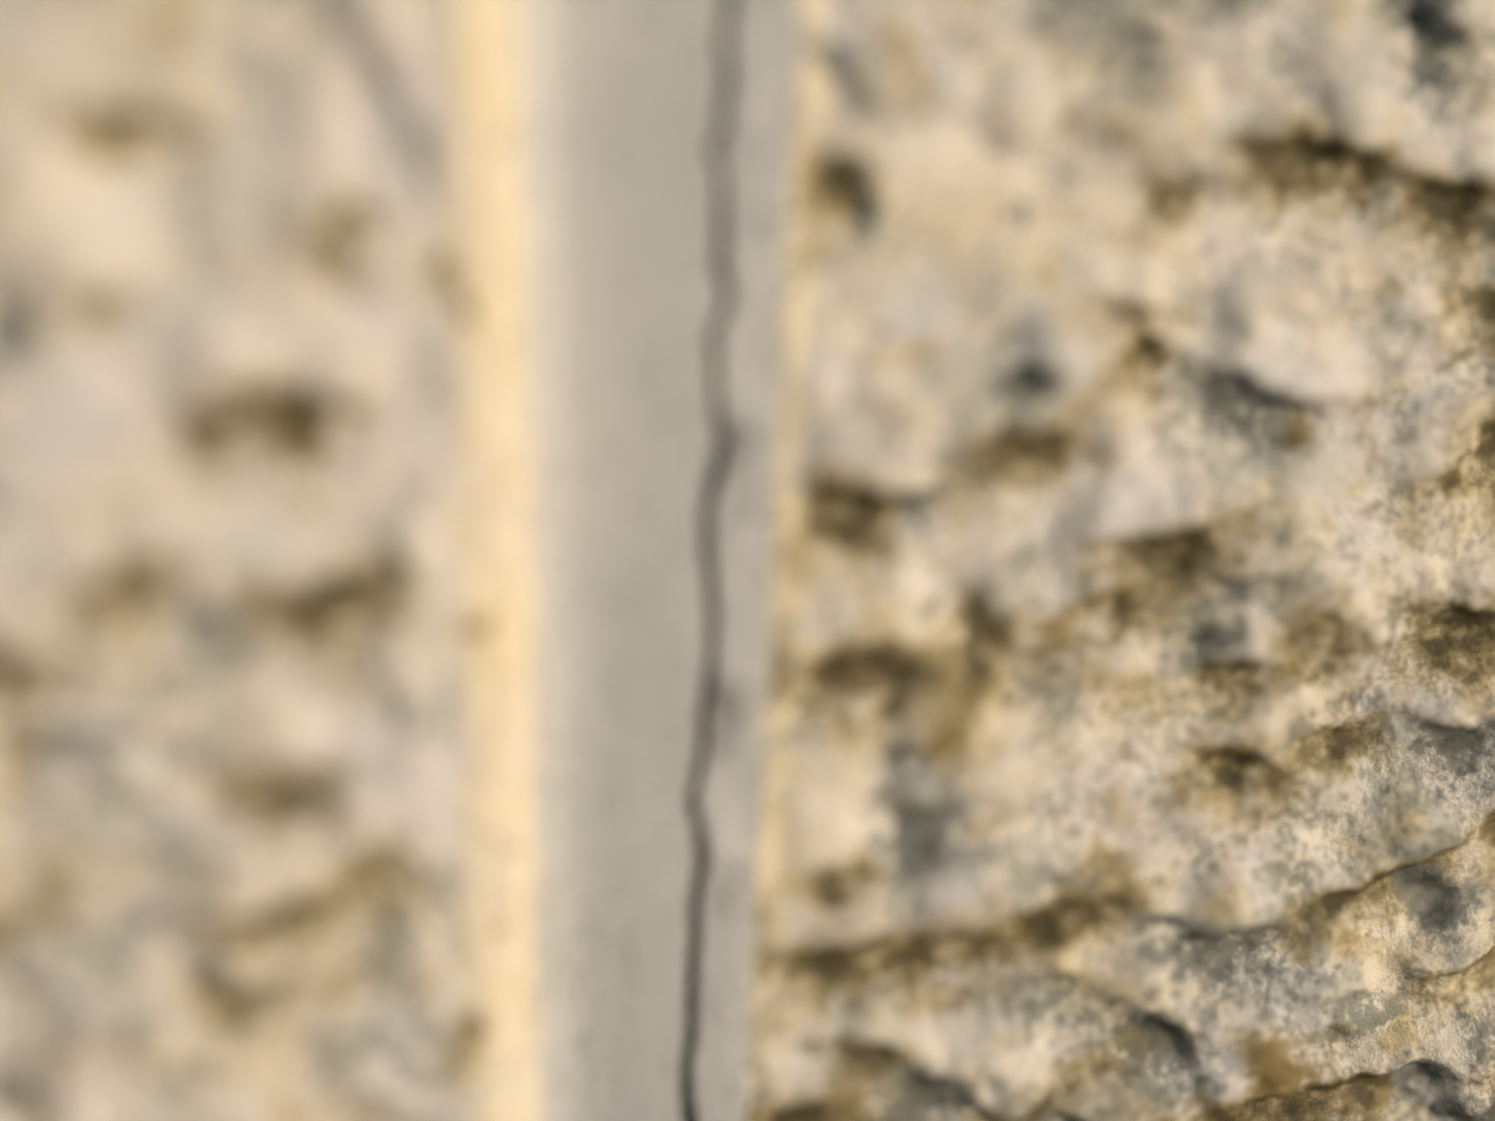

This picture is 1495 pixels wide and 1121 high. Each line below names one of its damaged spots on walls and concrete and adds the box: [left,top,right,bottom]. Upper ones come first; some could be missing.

crack [679,0,739,1121]